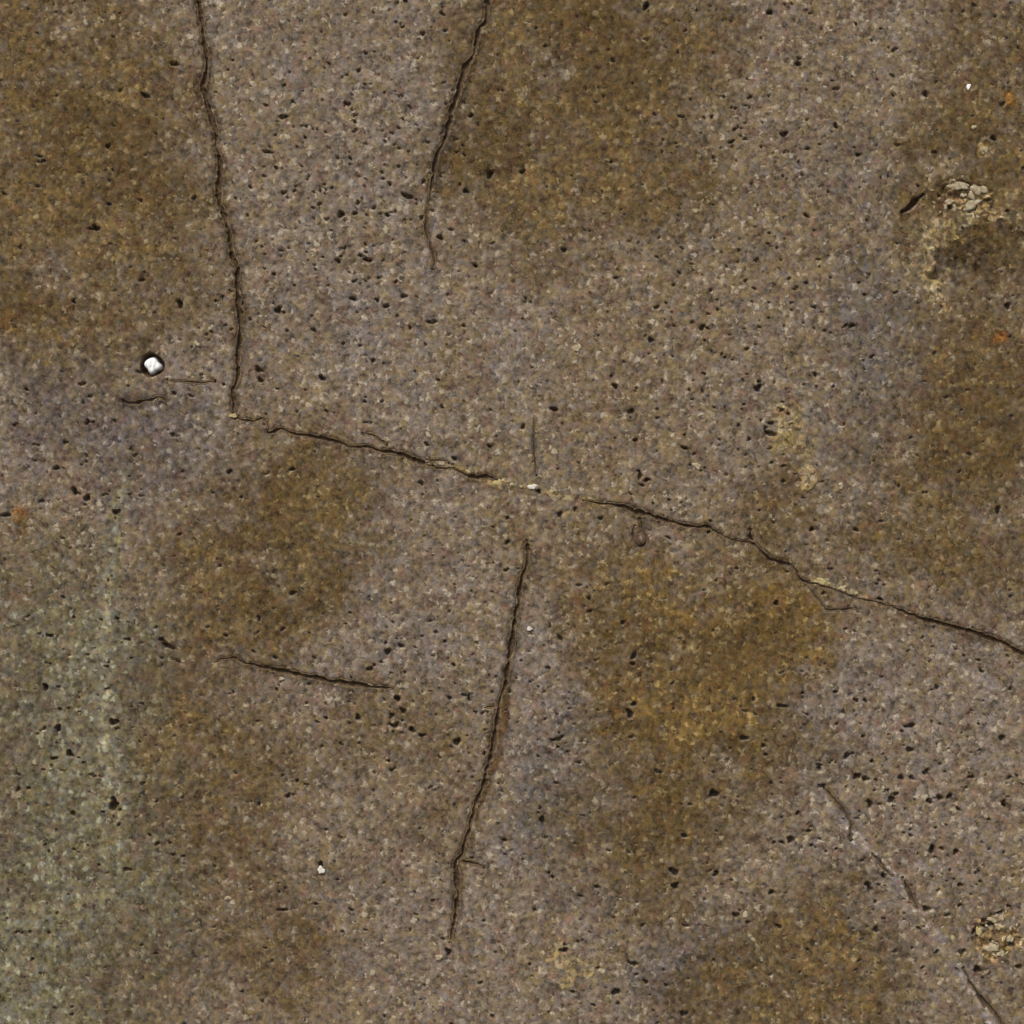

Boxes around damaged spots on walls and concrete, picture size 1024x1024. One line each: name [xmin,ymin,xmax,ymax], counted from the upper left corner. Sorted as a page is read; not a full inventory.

crack [123,0,1024,659]
crack [206,655,393,691]
crack [448,540,532,942]